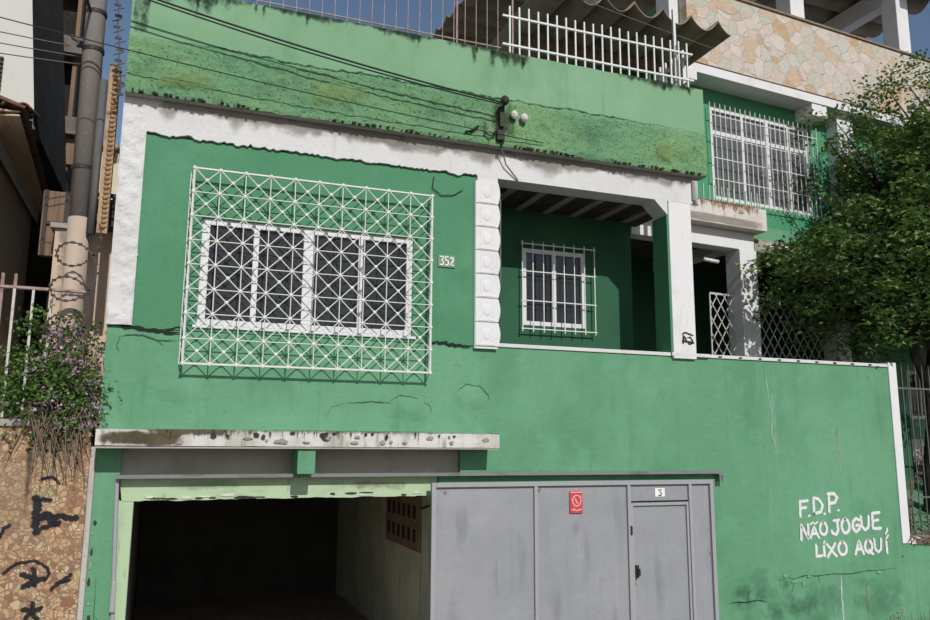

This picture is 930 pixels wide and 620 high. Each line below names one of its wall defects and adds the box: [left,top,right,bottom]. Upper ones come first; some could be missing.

damp [255,5,344,22]
damp [355,22,432,40]
damp [450,41,527,65]
damp [628,75,694,94]
rust [700,198,758,212]
crack [108,324,187,350]
peeling [244,432,295,444]
crack [779,568,895,593]